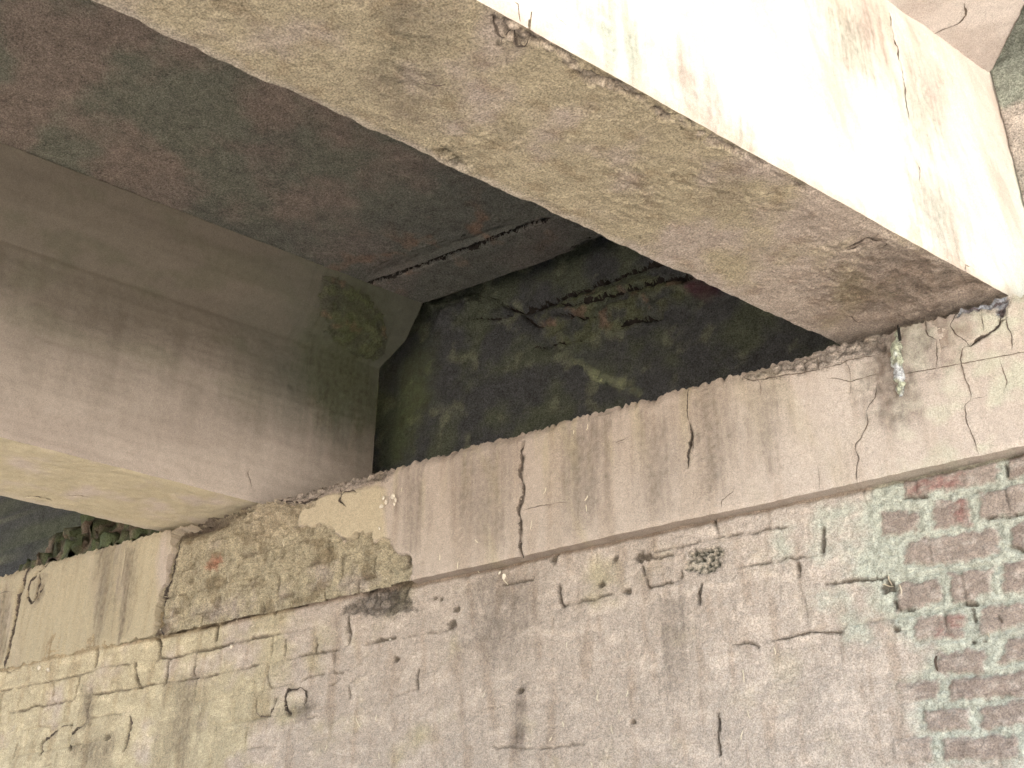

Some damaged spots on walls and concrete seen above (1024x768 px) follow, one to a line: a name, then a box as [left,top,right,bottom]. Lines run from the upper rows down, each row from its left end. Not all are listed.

crack [367,218,550,285]
crack [467,260,694,349]
crack [686,389,694,467]
crack [744,355,877,483]
water stain [877,325,911,405]
crack [906,305,1024,454]
crack [2,561,50,667]
crack [161,542,181,636]
spalling [155,469,422,637]
crack [516,445,565,558]